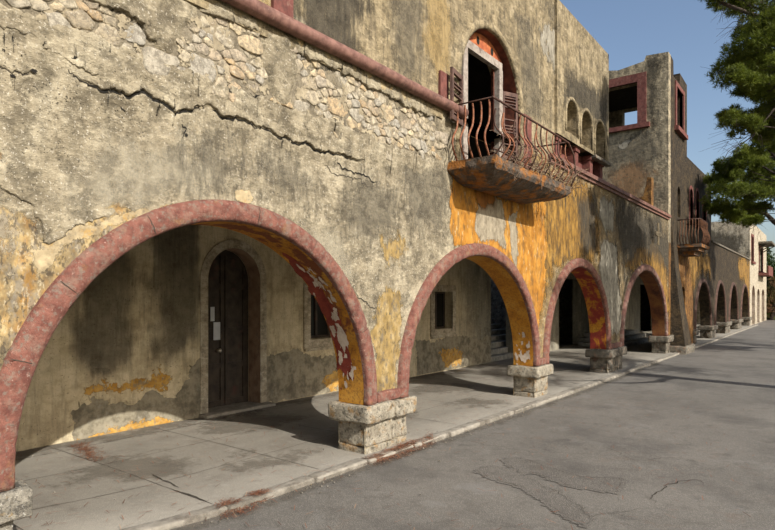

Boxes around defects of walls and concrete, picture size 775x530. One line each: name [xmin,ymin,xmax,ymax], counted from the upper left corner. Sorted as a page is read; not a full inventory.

crack [0,0,451,187]
flaking render [0,0,453,162]
peeling [0,153,150,370]
peeling [66,358,200,440]
peeling [267,252,356,403]
peeling [450,178,547,329]
peeling [514,332,530,366]